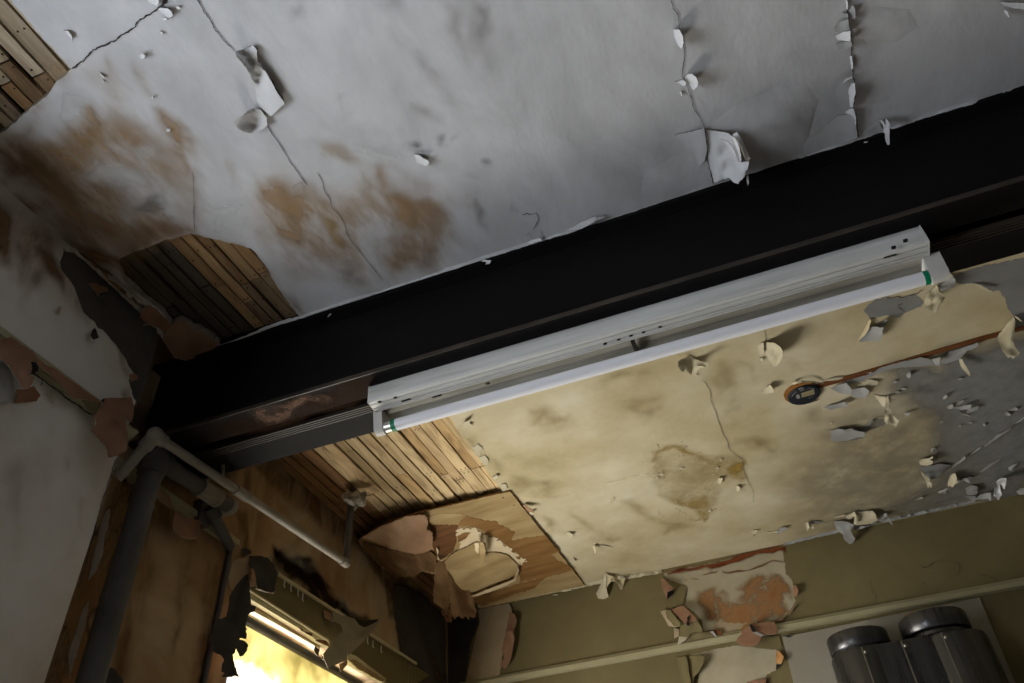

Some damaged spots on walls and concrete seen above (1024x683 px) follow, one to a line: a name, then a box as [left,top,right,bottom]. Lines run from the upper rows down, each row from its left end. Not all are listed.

crack [72,0,174,69]
crack [197,0,234,51]
leakage [162,114,181,143]
peeling [234,45,285,133]
crack [671,2,714,185]
peeling [675,128,750,184]
leakage [0,107,138,294]
leakage [261,185,313,241]
crack [267,126,383,280]
spalling [60,245,220,406]
corrosion [255,397,318,422]
peeling [791,258,1024,544]